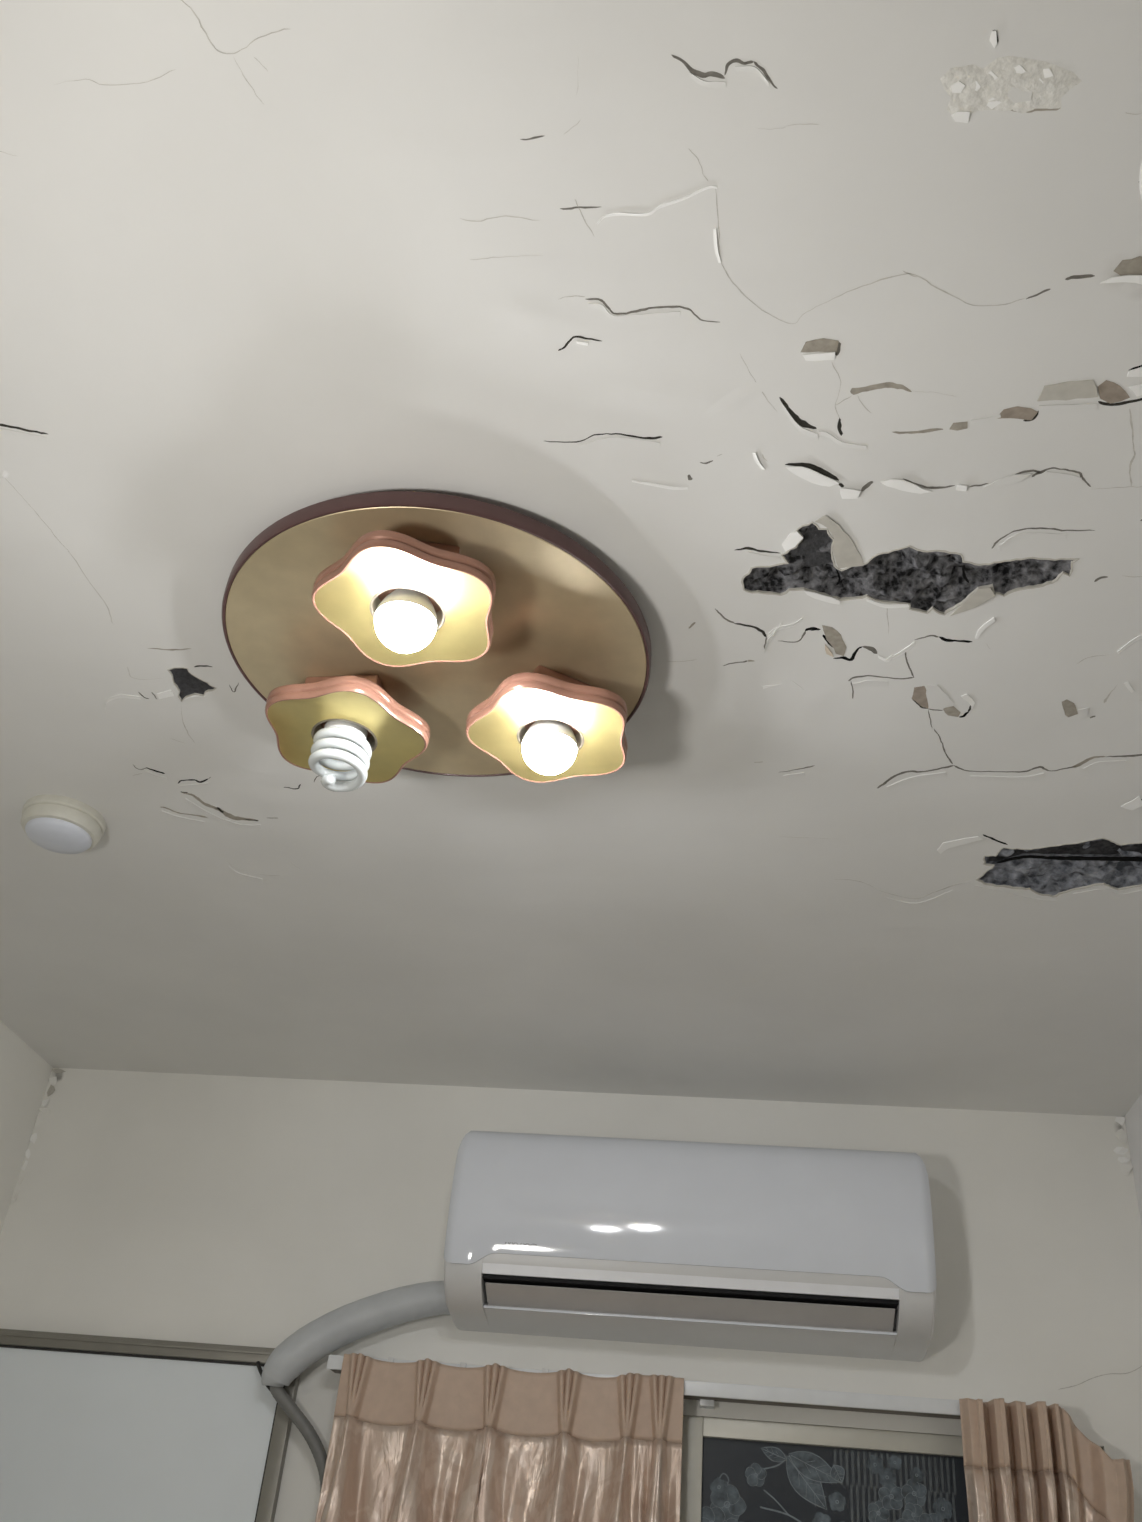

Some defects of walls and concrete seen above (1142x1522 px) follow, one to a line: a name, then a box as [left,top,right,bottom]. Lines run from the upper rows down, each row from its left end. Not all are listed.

crack [672,55,777,89]
peeling [940,30,1082,123]
crack [460,149,1025,324]
crack [558,295,717,351]
crack [740,354,867,450]
peeling [893,365,1142,434]
spalling [741,515,1079,616]
spalling [105,665,239,708]
crack [669,609,806,666]
crack [848,609,995,698]
crack [877,754,1142,793]
spalling [937,834,1142,905]